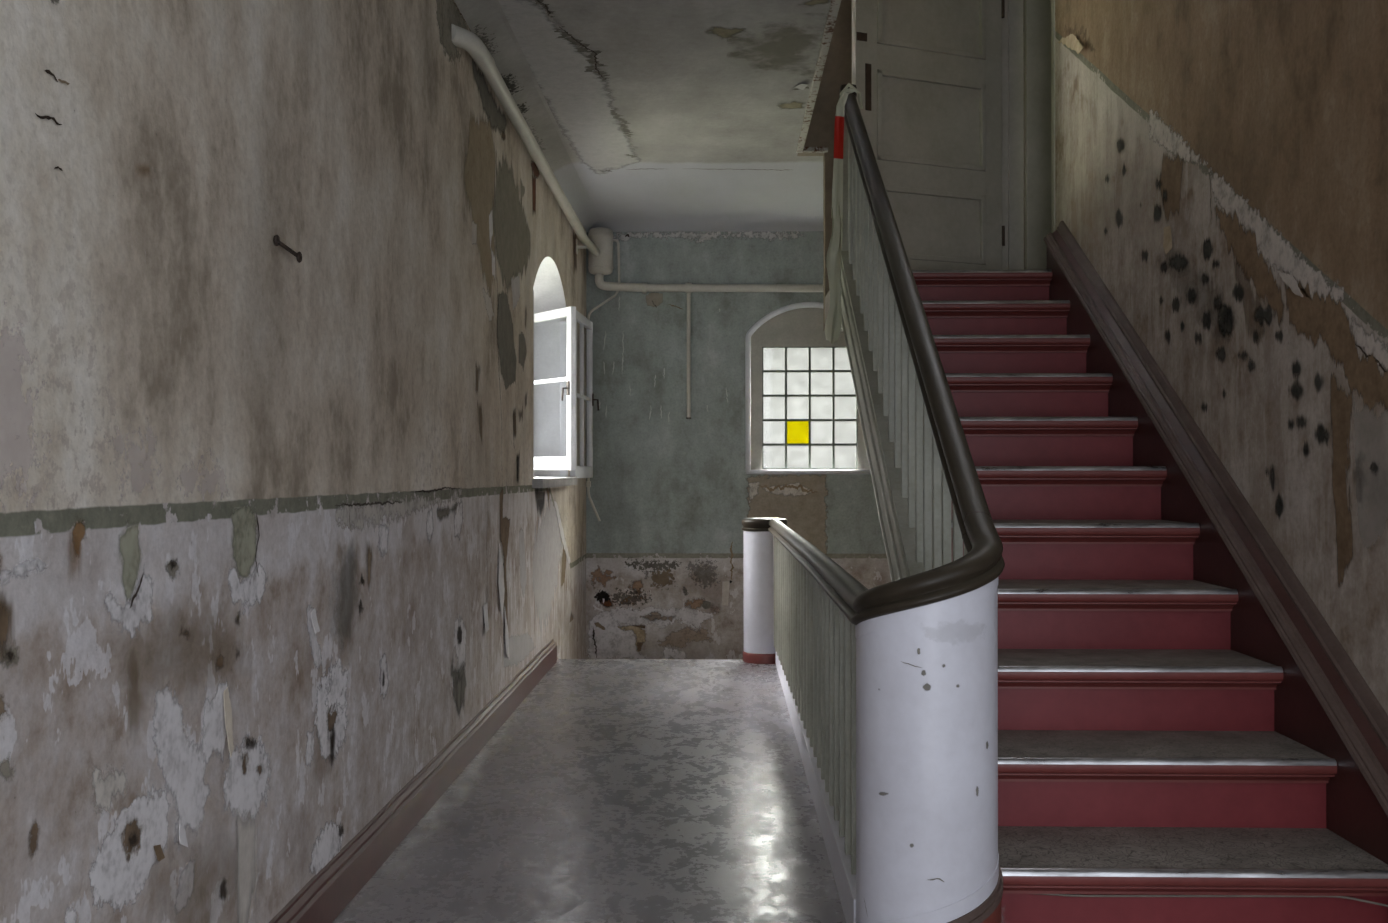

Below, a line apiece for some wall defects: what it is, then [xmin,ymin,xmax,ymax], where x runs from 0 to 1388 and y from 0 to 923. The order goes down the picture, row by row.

crack [533,0,653,172]
water stain [1105,139,1126,183]
peeling [1149,109,1344,302]
water stain [1142,250,1187,273]
water stain [1160,238,1282,372]
water stain [1288,361,1329,457]
water stain [1266,466,1283,519]
spalling [105,574,153,638]
peeling [588,589,718,659]
flaking render [306,605,348,765]
peeling [89,682,270,923]
peeling [310,822,343,874]